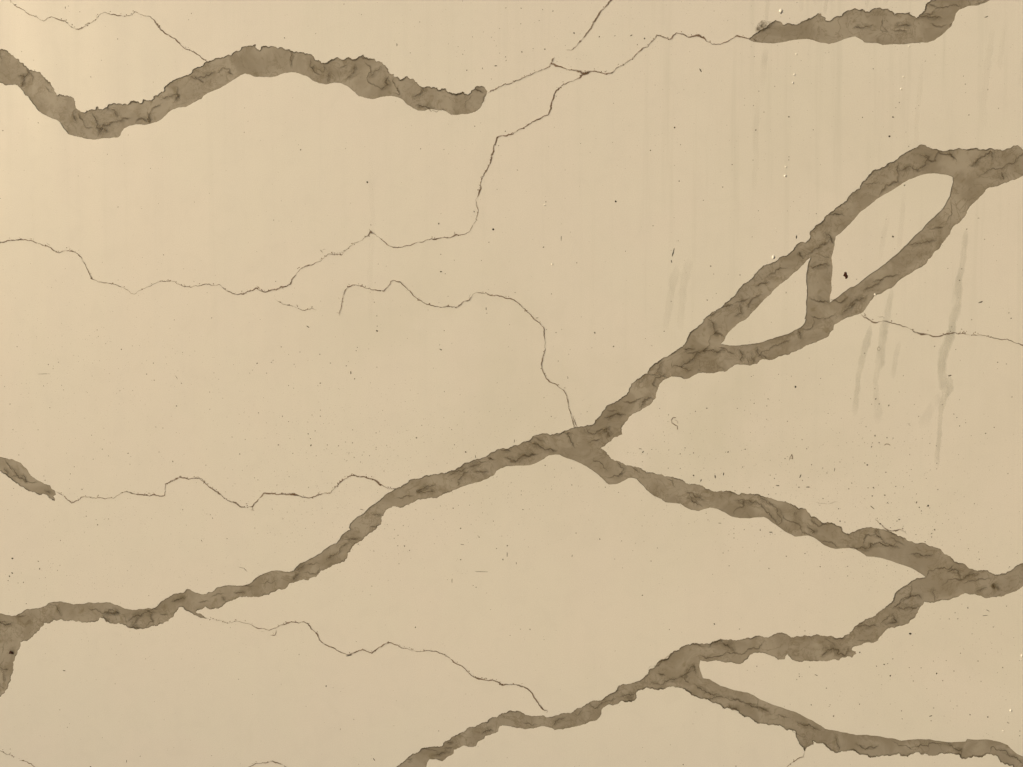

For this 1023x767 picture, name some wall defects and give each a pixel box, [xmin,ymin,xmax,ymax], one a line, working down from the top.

crack [0,0,989,311]
crack [339,280,545,339]
crack [886,320,976,337]
crack [0,457,112,503]
crack [165,476,321,508]
crack [283,621,547,711]